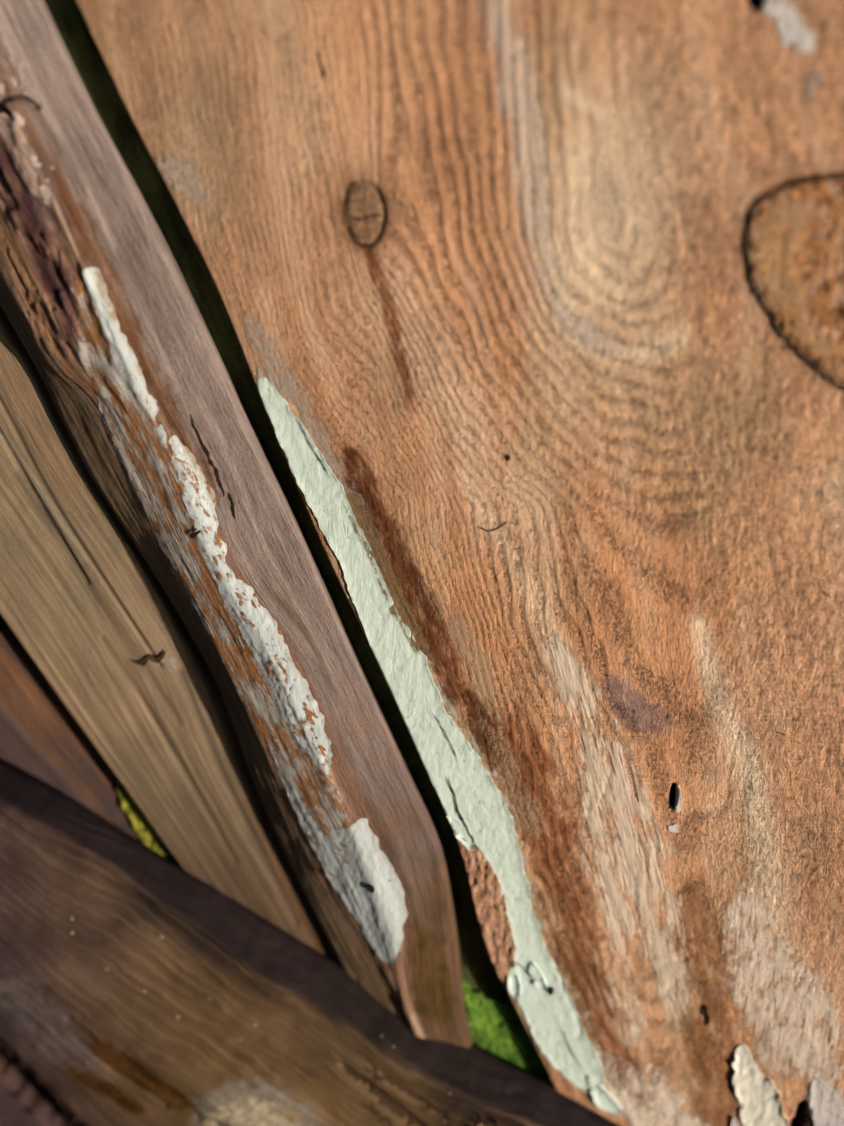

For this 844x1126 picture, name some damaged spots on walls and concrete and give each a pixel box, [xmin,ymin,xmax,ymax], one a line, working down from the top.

crack [0,95,38,117]
peeling [72,267,408,964]
peeling [257,371,639,1126]
peeling [731,1044,789,1126]
peeling [806,1073,844,1126]